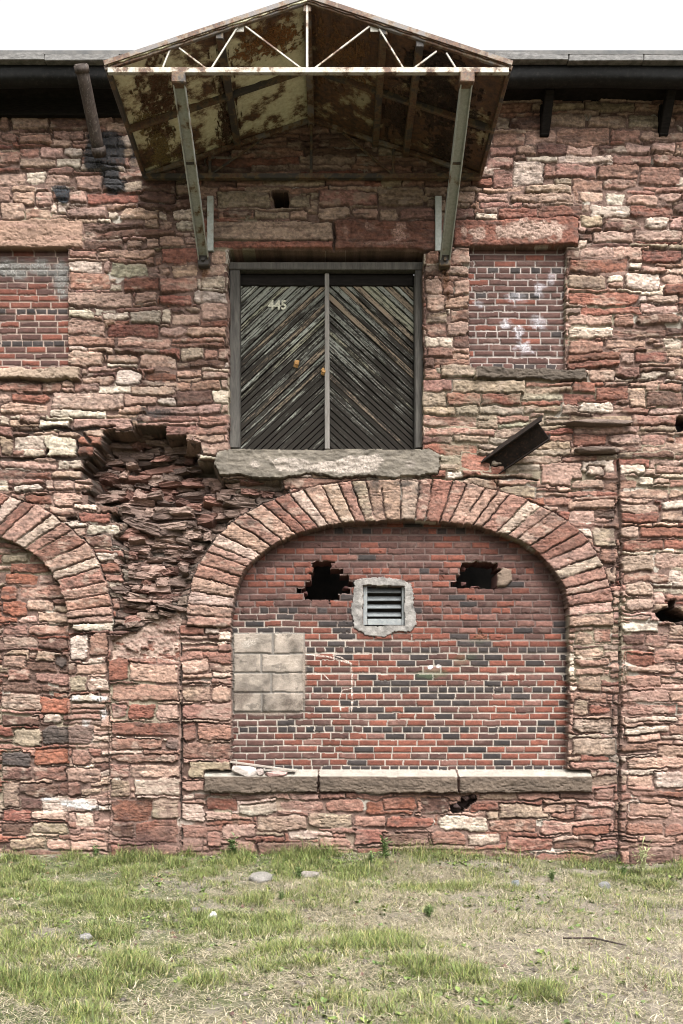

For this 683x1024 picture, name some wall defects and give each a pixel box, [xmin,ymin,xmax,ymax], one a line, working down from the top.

corrosion [208,13,372,147]
corrosion [124,53,183,168]
peeling [272,454,384,474]
peeling [93,446,274,653]
hole [301,561,352,604]
hole [451,561,502,590]
hole [658,600,683,625]
hole [450,794,477,814]